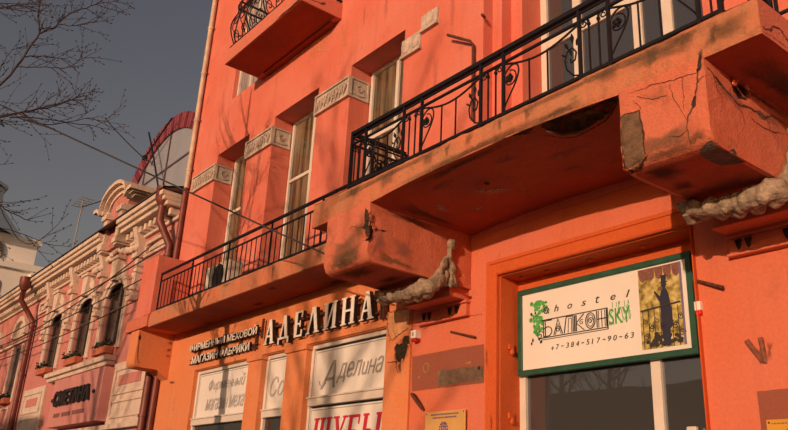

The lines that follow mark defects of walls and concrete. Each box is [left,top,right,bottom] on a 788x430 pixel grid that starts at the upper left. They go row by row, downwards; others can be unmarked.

crack [763,25,788,48]
crack [631,49,786,145]
hole [730,76,751,99]
spalling [542,98,647,174]
spalling [362,208,376,242]
peeling [386,308,411,362]